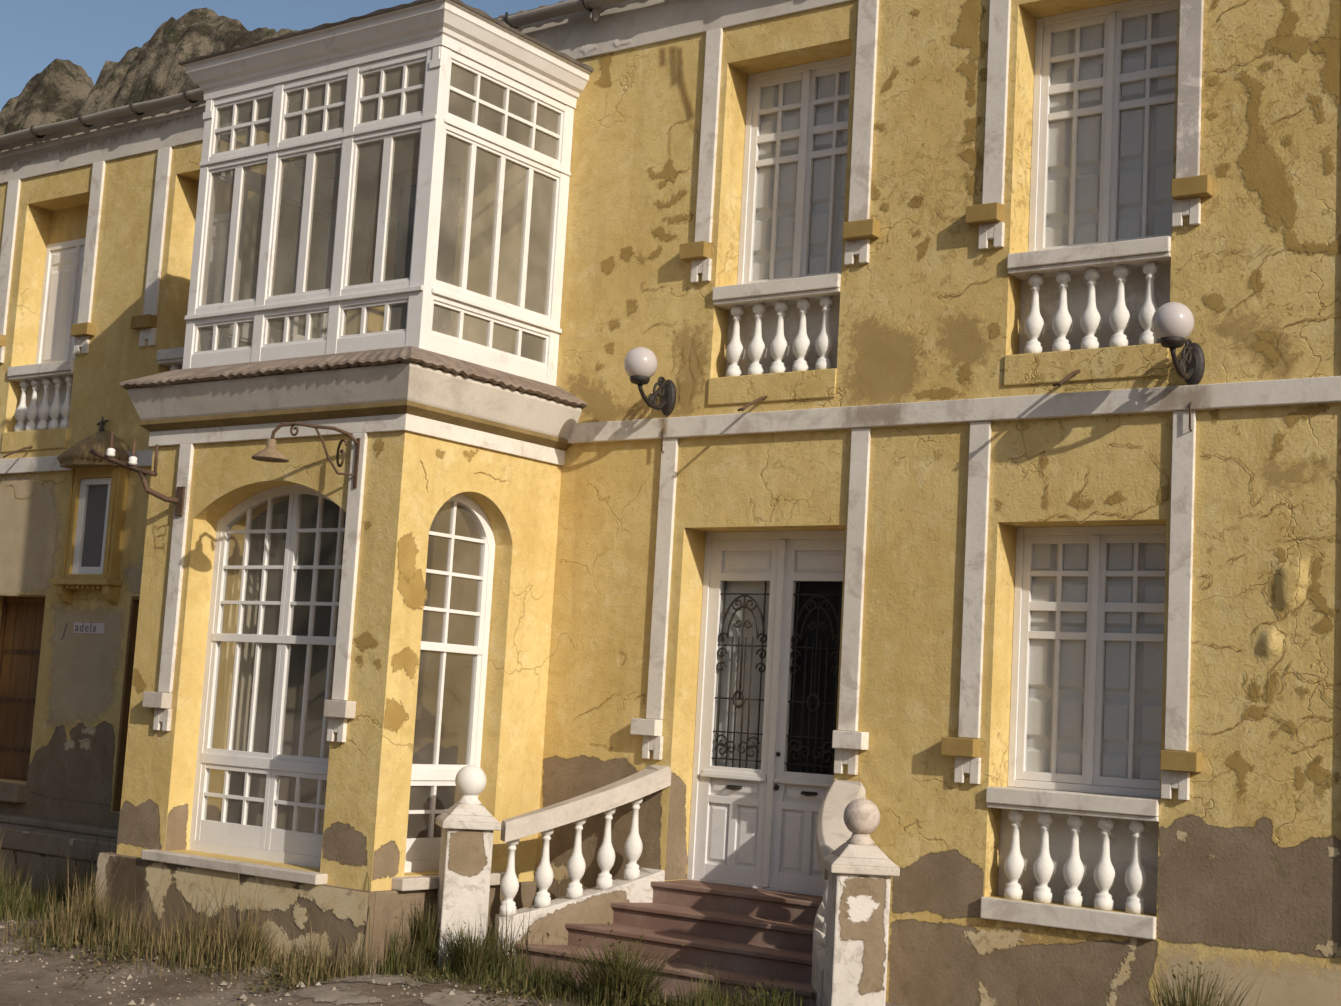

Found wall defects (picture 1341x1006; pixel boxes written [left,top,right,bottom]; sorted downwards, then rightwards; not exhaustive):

peeling [951,0,988,197]
peeling [1216,0,1341,256]
peeling [602,158,693,275]
crack [1002,442,1169,526]
peeling [354,630,420,687]
peeling [397,531,428,610]
crack [1196,453,1341,753]
peeling [27,721,188,921]
peeling [235,876,365,974]
peeling [322,821,400,881]
peeling [448,829,488,877]
peeling [838,814,1341,1006]